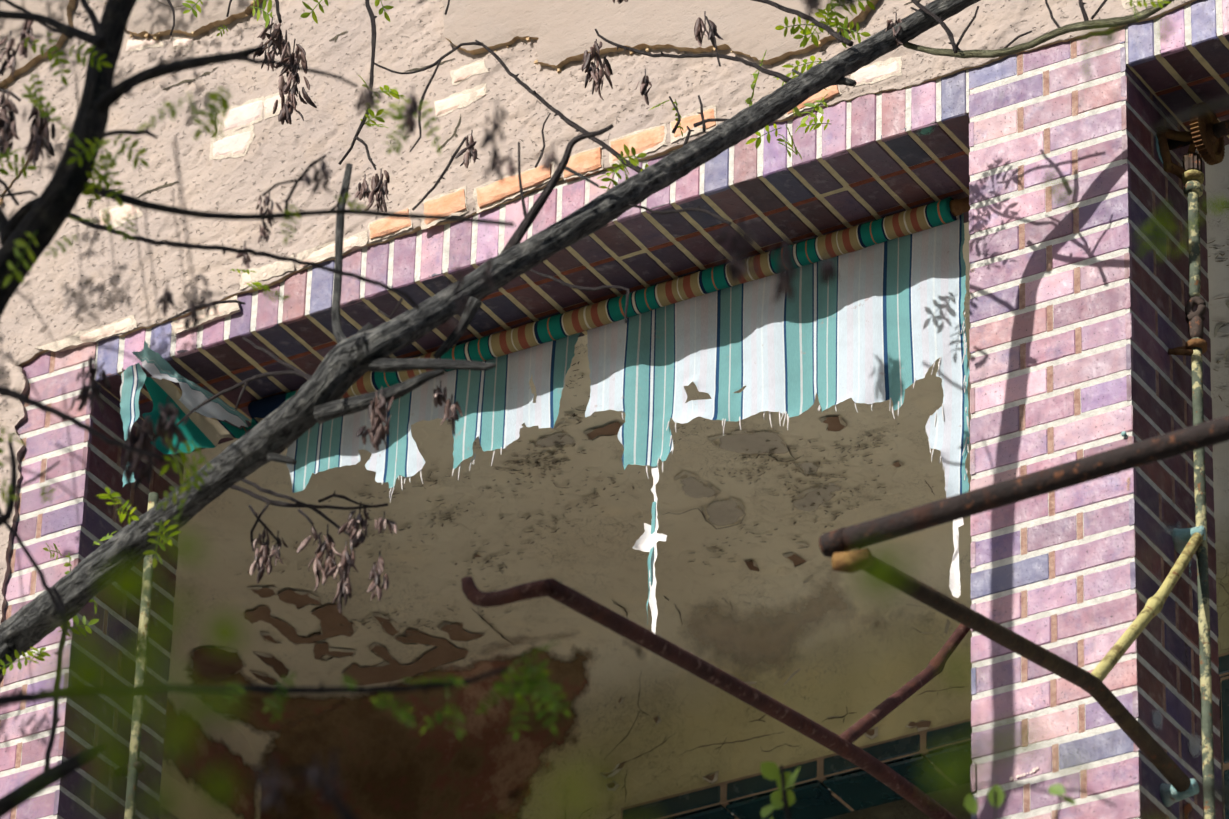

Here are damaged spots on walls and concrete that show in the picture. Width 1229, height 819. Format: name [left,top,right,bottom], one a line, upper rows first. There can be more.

peeling [125,0,263,52]
flaking render [209,92,287,161]
peeling [434,0,879,118]
flaking render [784,56,902,117]
flaking render [171,105,718,335]
flaking render [35,315,137,352]
peeling [339,347,640,592]
peeling [673,415,904,575]
peeling [190,536,486,686]